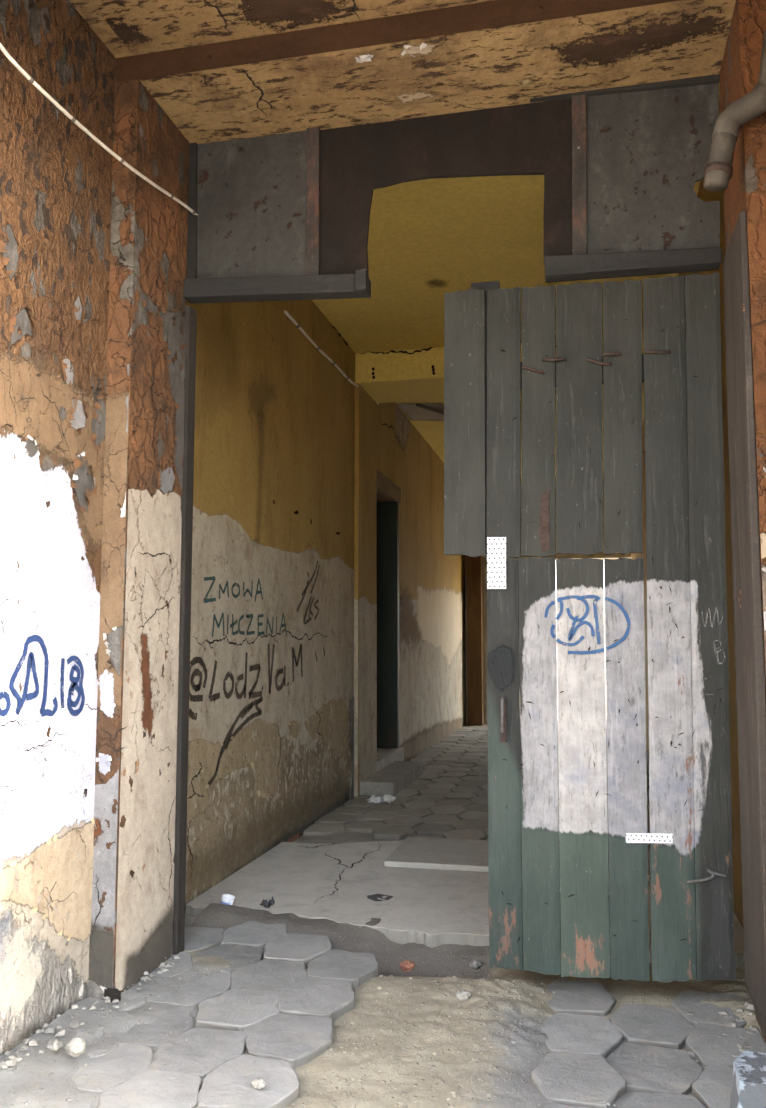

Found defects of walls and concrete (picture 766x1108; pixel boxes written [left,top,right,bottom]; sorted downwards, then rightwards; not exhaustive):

peeling [142,292,187,496]
peeling [19,435,40,461]
spalling [60,353,106,512]
crack [0,719,67,753]
crack [84,704,126,753]